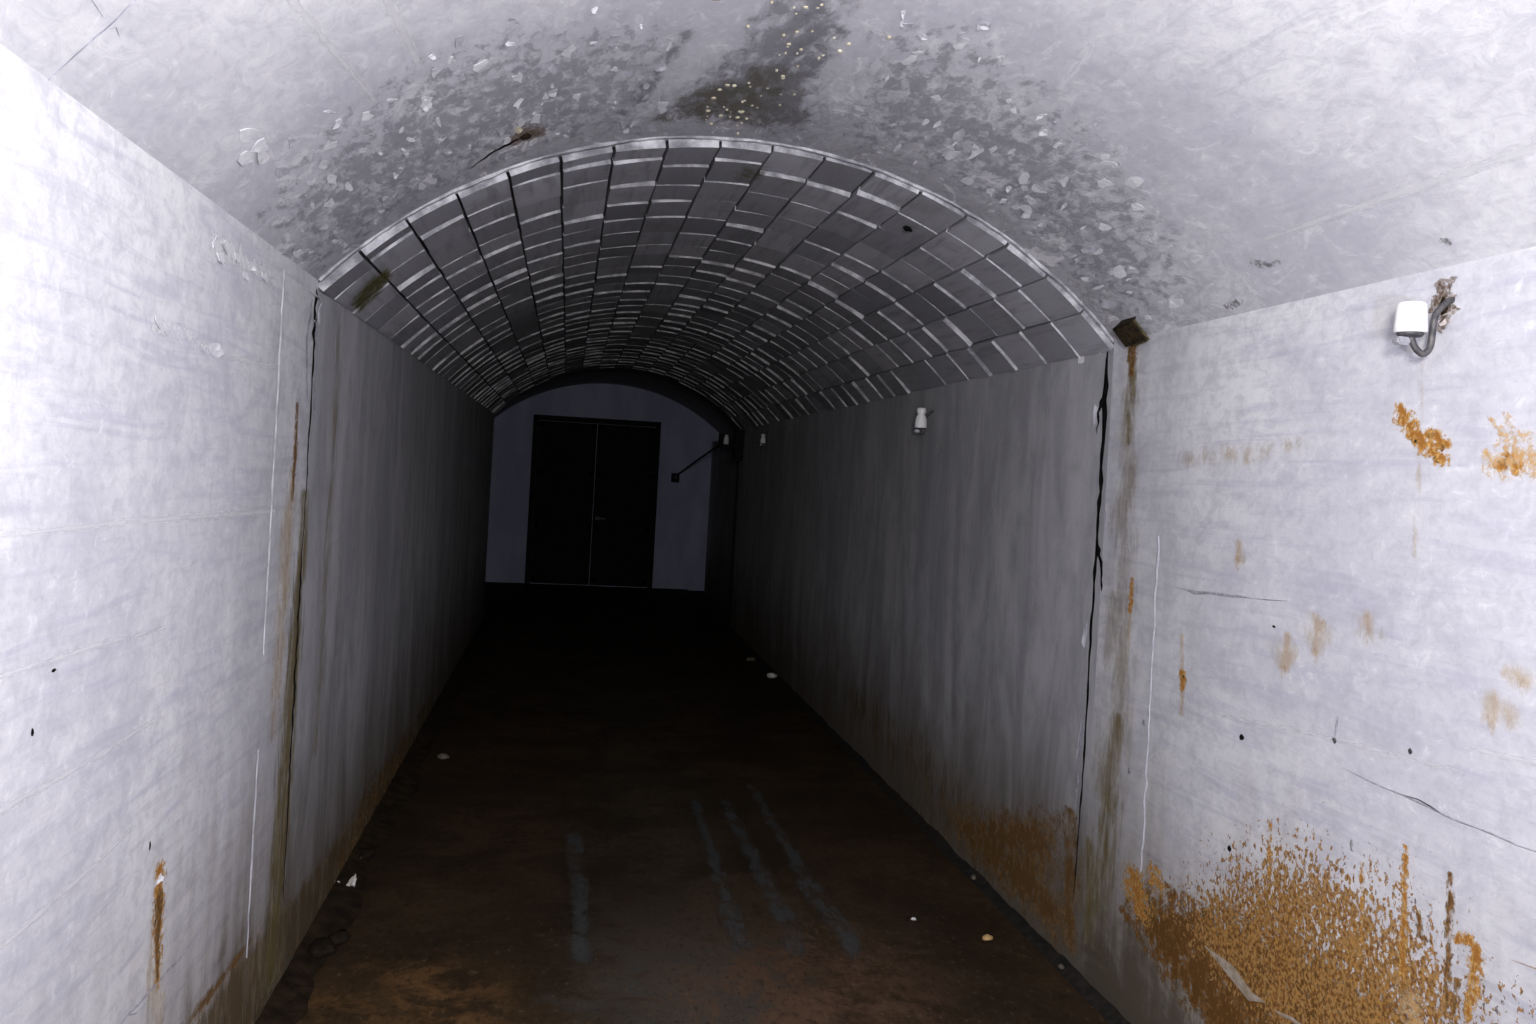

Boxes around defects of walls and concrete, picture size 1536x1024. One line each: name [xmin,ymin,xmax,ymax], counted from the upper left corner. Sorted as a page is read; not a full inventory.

crack [48,0,136,81]
peeling [238,7,622,270]
peeling [614,41,681,133]
water stain [654,0,851,135]
peeling [866,11,1216,324]
water stain [263,270,285,655]
corrosion [1392,403,1452,467]
corrosion [1482,412,1536,480]
corrosion [152,860,167,989]
water stain [191,690,434,1024]
corrosion [1119,818,1536,1024]
crack [1342,767,1536,852]